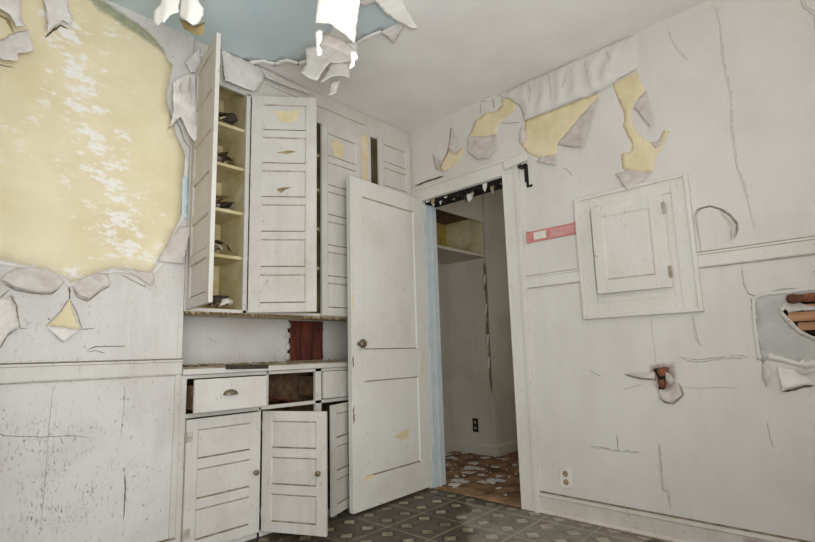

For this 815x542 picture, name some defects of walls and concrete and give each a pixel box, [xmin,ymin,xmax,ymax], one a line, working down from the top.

crack [712,4,754,226]
peeling [0,0,418,348]
flaking render [284,320,323,362]
flaking render [751,287,815,369]
flaking render [622,367,684,405]